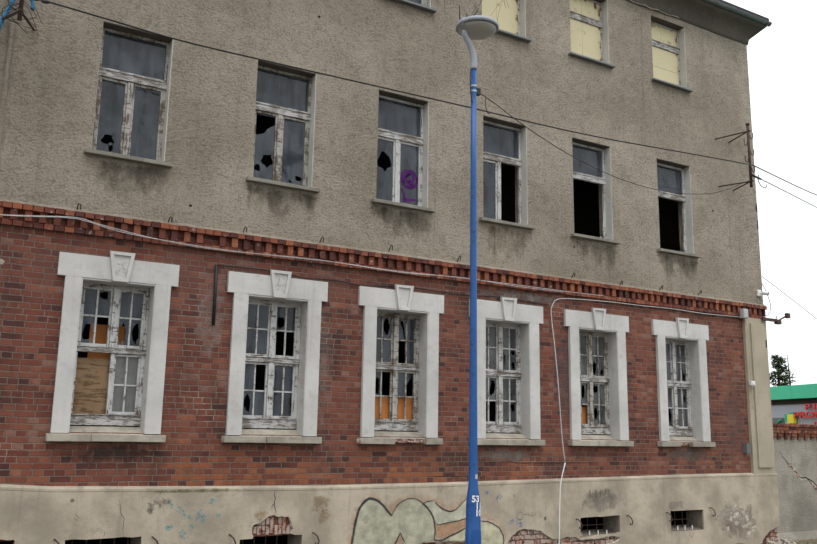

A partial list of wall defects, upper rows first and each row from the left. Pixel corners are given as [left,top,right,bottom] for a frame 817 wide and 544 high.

crack [780,452,817,490]
spalling [252,515,293,535]
spalling [508,529,621,544]